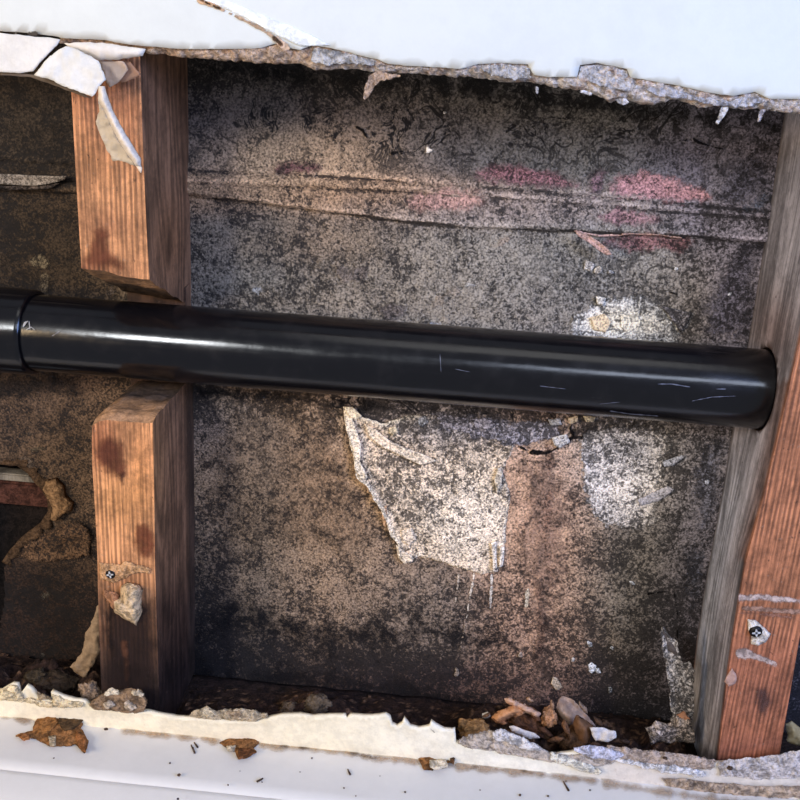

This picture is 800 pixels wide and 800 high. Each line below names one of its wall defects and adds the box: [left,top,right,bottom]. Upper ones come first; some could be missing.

peeling [30,254,49,292]
water stain [98,439,125,481]
crack [519,424,584,455]
spalling [0,447,91,567]
peeling [343,406,684,575]